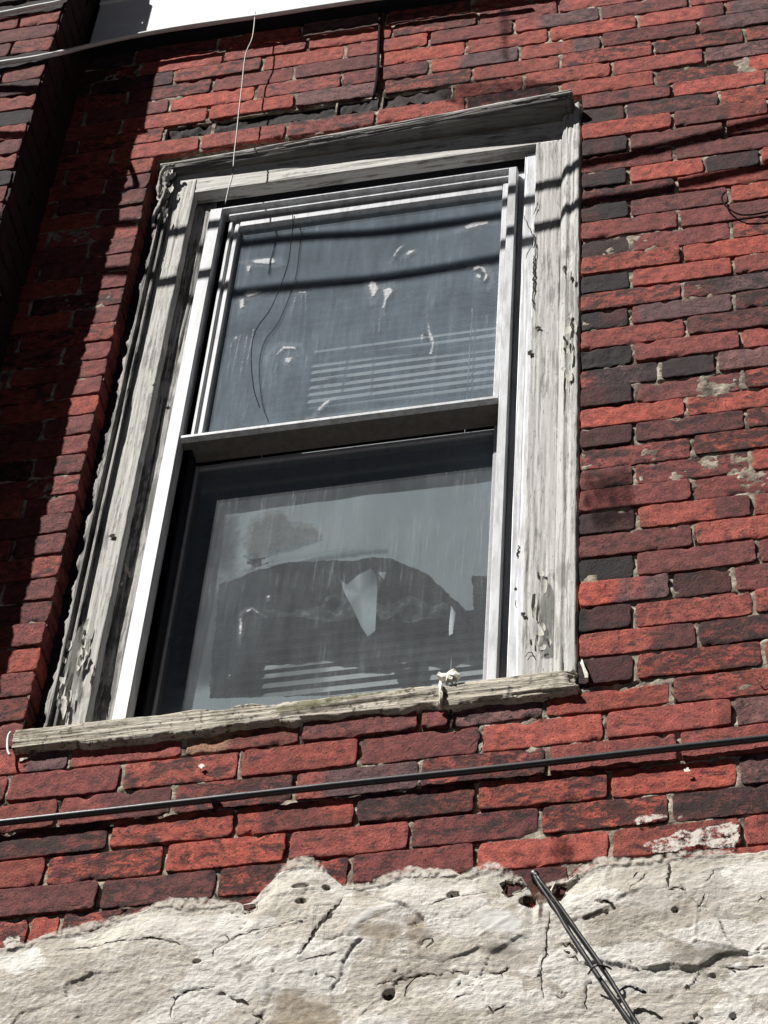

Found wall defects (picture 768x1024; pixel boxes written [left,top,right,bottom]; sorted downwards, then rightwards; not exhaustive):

peeling [530,570,555,654]
peeling [50,618,89,719]
crack [214,893,256,901]
peeling [497,878,527,897]
crack [585,864,679,920]
crack [54,935,181,951]
crack [212,899,343,979]
crack [537,912,591,1009]
crack [726,952,764,972]
crack [169,986,263,1020]